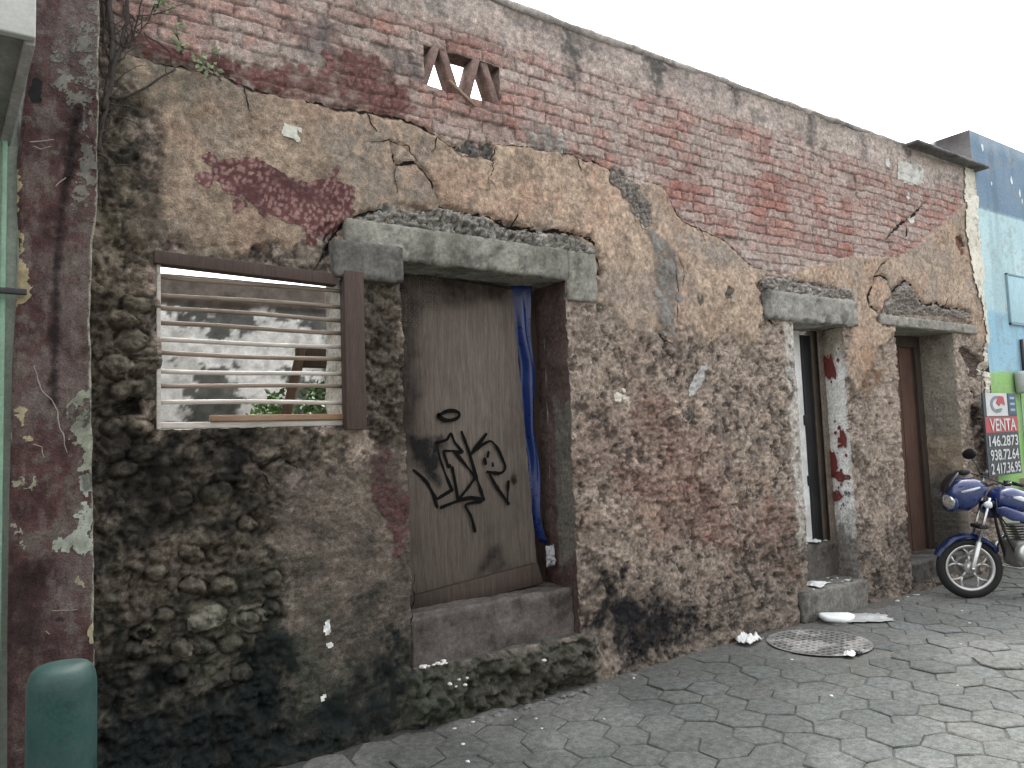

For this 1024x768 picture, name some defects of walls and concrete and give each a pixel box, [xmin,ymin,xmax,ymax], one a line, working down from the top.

peeling [49,3,100,210]
peeling [131,34,415,119]
crack [129,54,610,275]
peeling [195,152,597,254]
spalling [455,137,495,161]
spalling [609,164,654,229]
spalling [759,276,857,302]
crack [866,206,966,312]
spalling [955,232,967,255]
peeling [52,389,93,555]
damp [588,567,709,666]
damp [97,608,403,768]